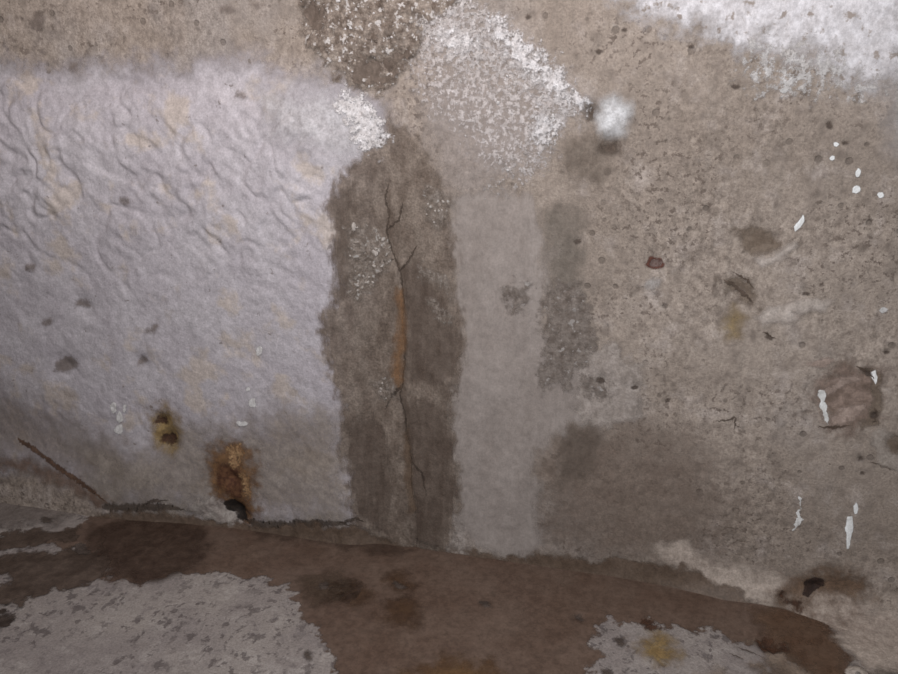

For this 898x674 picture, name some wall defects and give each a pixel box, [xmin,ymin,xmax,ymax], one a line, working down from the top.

water stain [410,0,593,189]
rust [152,407,181,451]
rust [208,441,260,524]
crack [379,184,427,547]
water stain [263,89,645,560]
water stain [546,438,710,549]
spalling [811,358,898,472]
water stain [0,510,855,674]